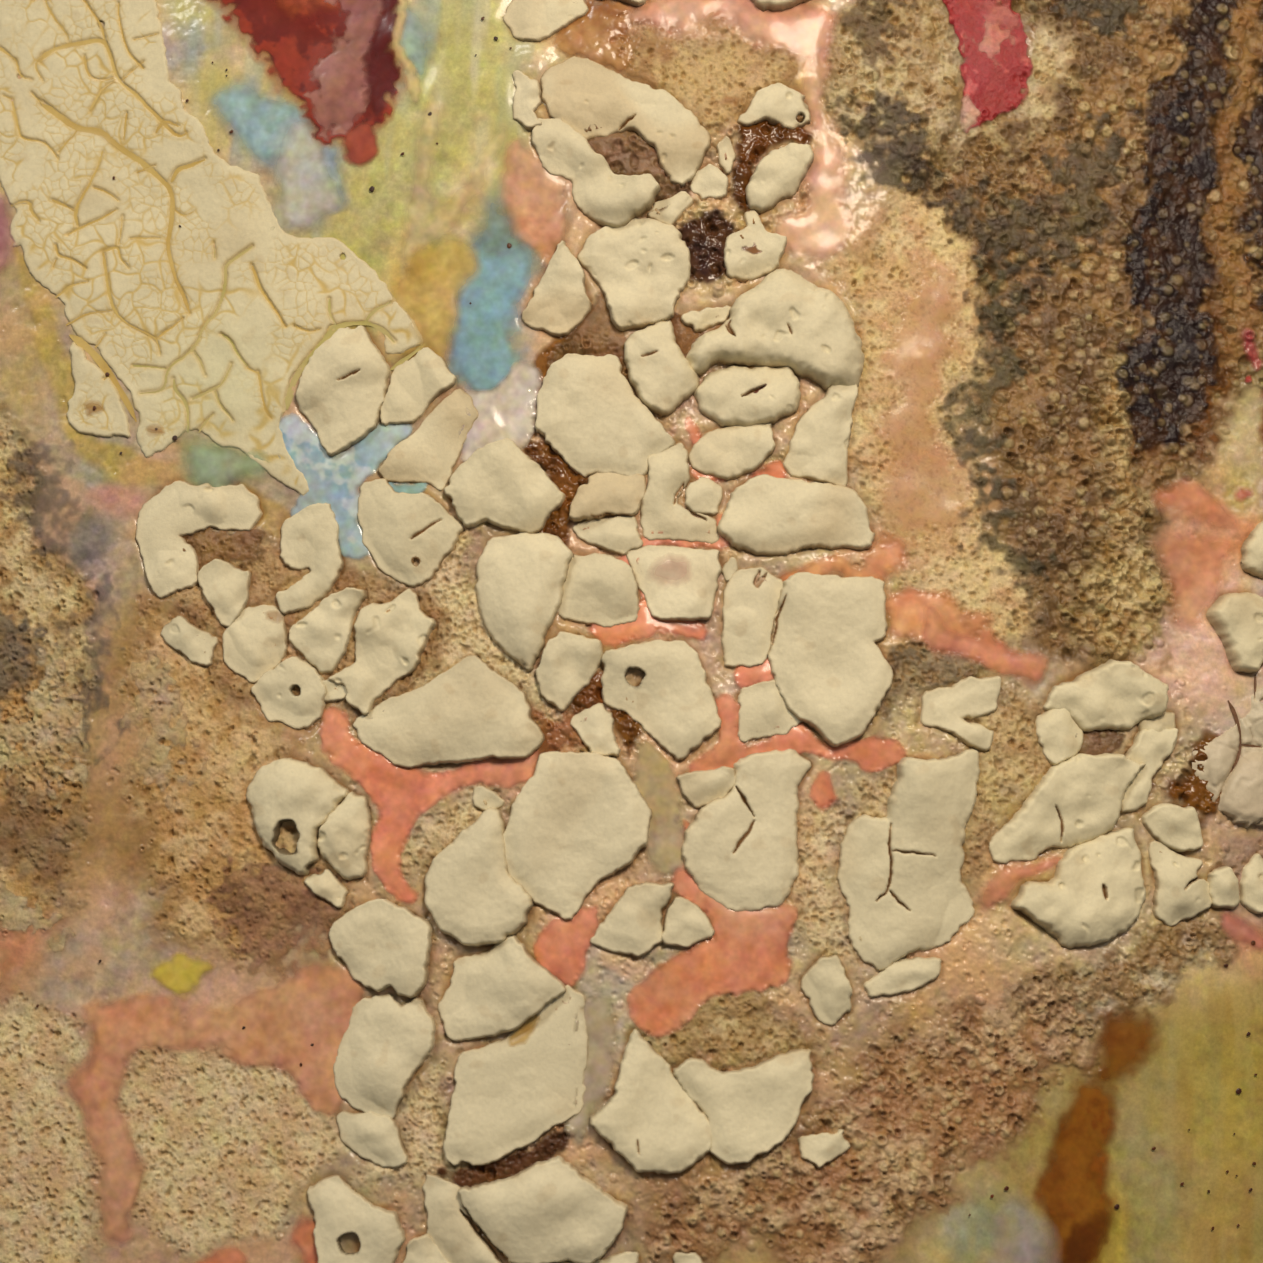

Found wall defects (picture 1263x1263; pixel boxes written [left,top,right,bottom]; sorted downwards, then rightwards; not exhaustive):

crack [0,0,425,433]
peeling [0,0,893,1174]
peeling [800,749,980,1026]
peeling [989,659,1263,949]
peeling [1206,592,1263,673]
crack [1228,674,1261,776]
peeling [1240,521,1263,579]
peeling [307,1156,639,1263]
peeling [672,1252,704,1263]
rust [1035,1012,1153,1263]